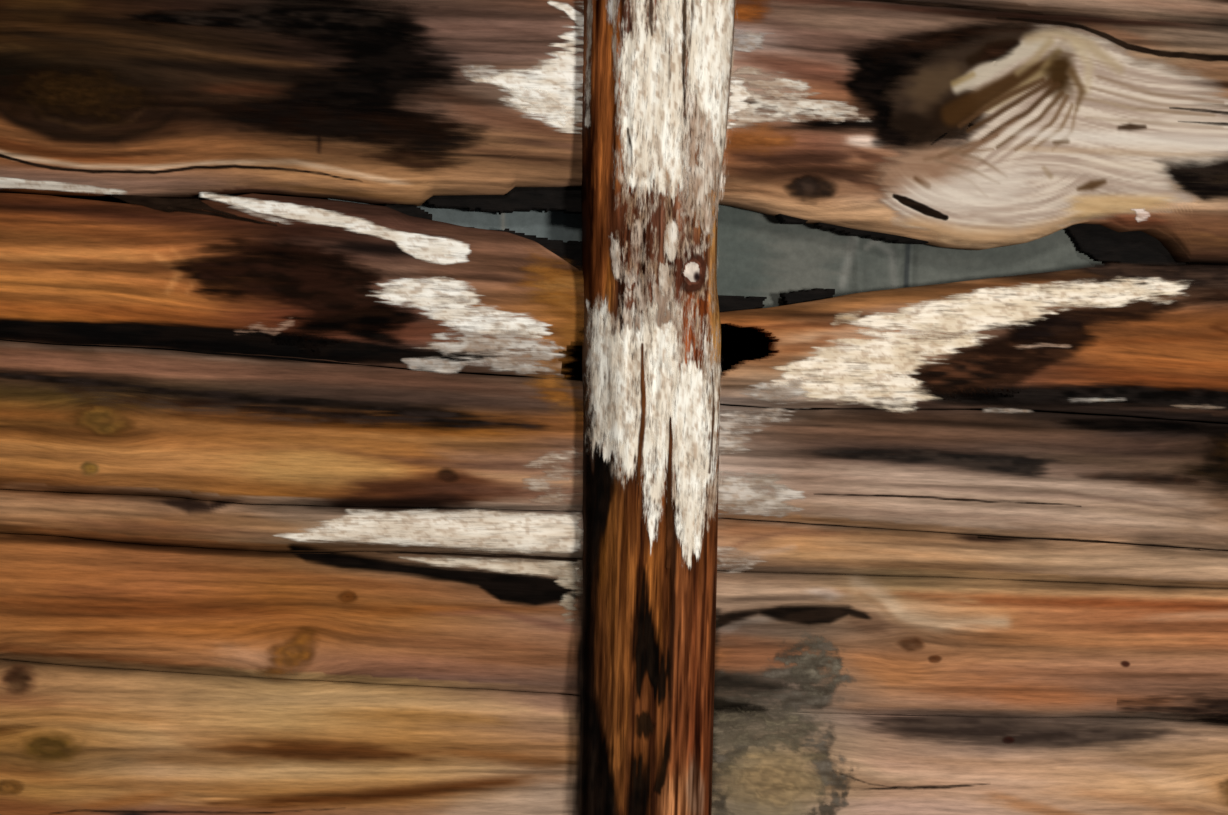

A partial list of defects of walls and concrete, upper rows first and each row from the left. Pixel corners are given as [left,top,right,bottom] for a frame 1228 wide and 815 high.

leakage [130,0,480,168]
crack [893,194,948,220]
leakage [0,239,497,364]
leakage [911,264,1228,485]
leakage [815,448,1052,476]
leakage [289,445,671,815]
leakage [712,606,870,815]